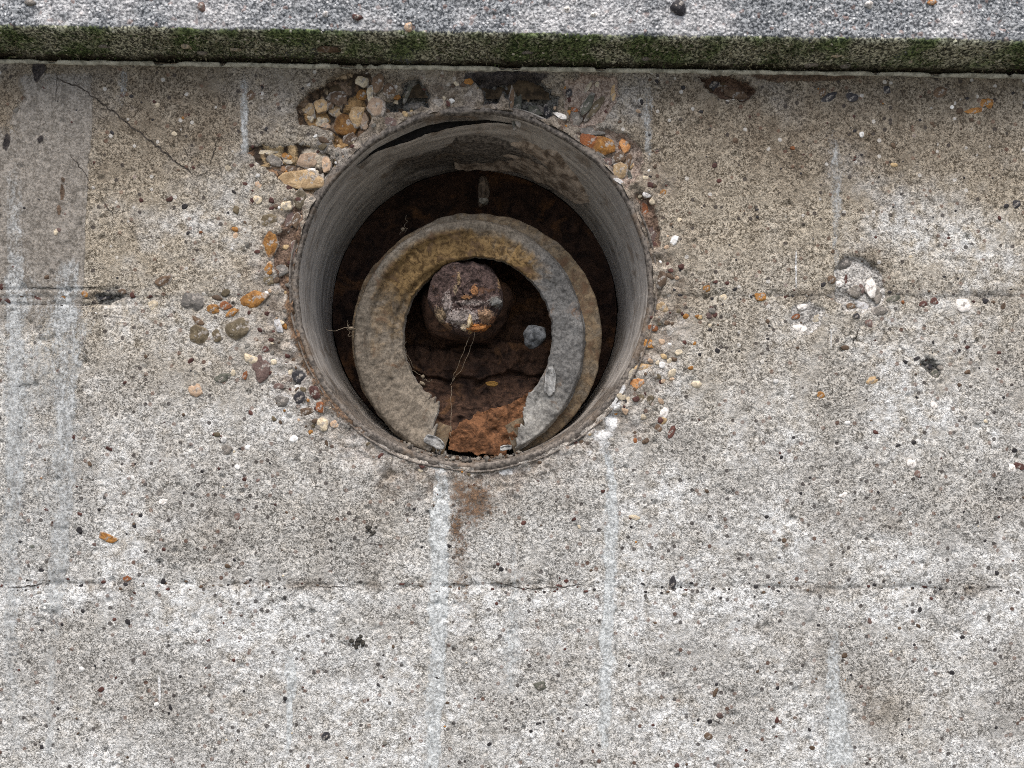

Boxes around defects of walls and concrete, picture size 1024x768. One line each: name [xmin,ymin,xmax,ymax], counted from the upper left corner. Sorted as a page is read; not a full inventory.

crack [55,72,219,176]
spalling [246,72,430,195]
spalling [478,74,660,248]
corrosion [405,260,552,439]
water stain [425,468,450,768]
corrosion [451,481,492,553]
water stain [587,385,625,747]